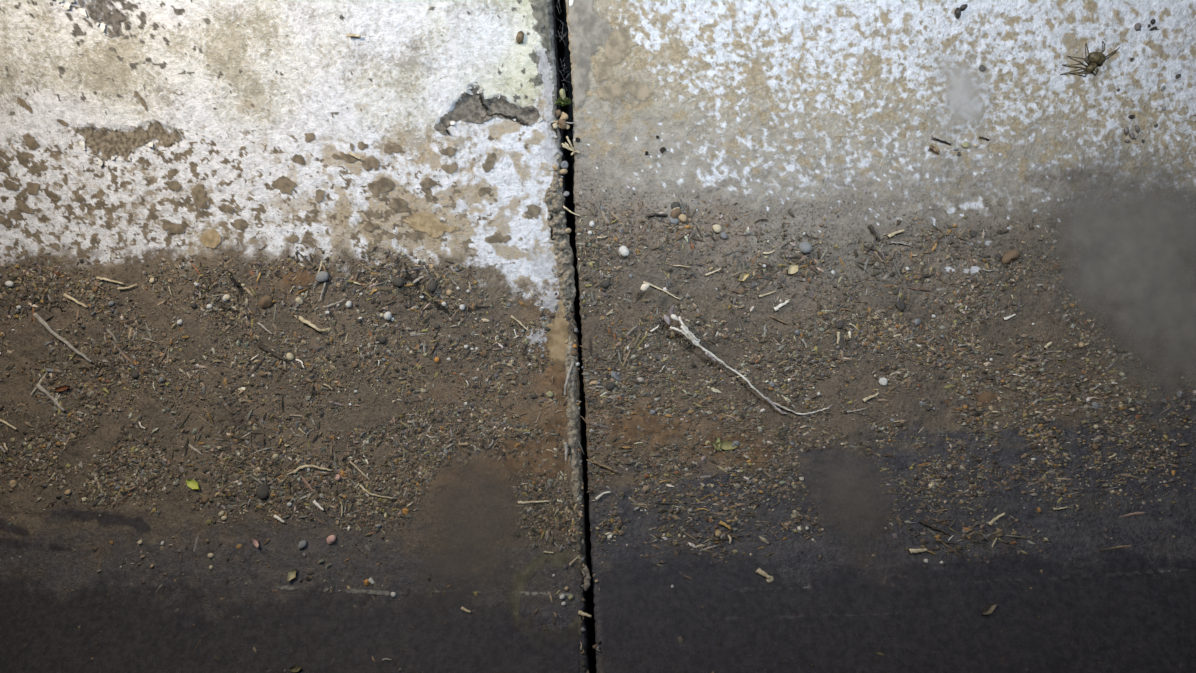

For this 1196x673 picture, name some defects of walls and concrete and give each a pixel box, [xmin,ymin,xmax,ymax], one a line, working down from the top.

peeling [57,0,130,37]
spalling [434,85,558,138]
peeling [73,120,182,166]
damp [485,233,511,243]
damp [52,509,149,532]
damp [0,552,581,673]
damp [600,550,1196,673]